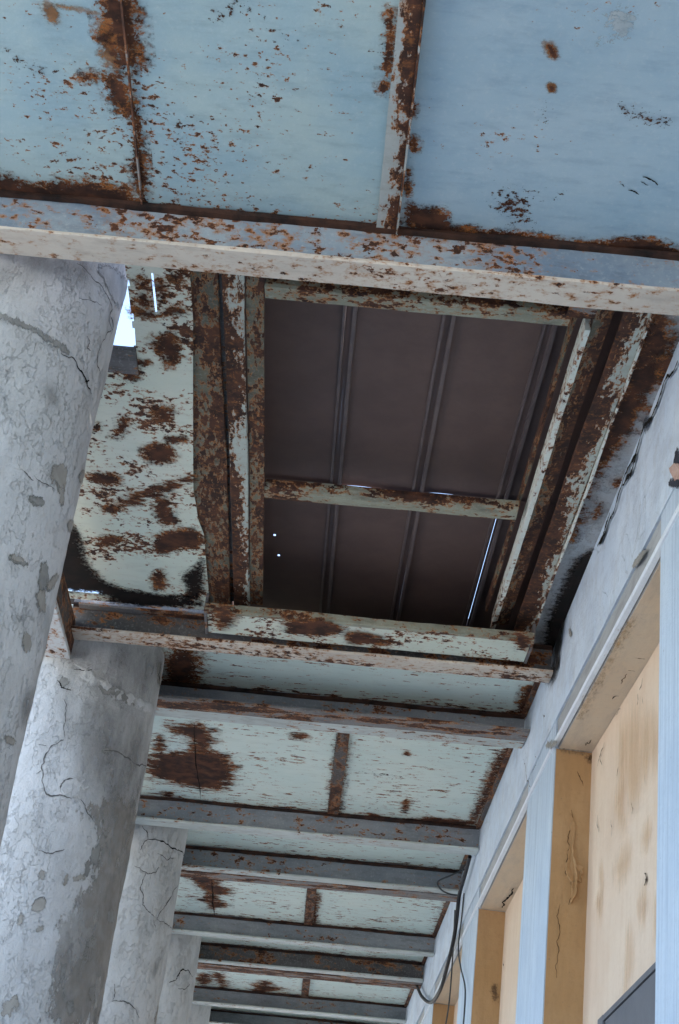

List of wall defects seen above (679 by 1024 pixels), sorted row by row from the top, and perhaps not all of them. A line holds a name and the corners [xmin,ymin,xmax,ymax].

corrosion [0,0,159,202]
corrosion [399,169,679,253]
corrosion [121,271,188,384]
peeling [8,554,59,613]
peeling [27,495,45,507]
peeling [50,463,85,506]
corrosion [97,475,207,599]
corrosion [566,314,679,544]
crack [597,360,678,547]
crack [38,700,70,798]
corrosion [145,719,247,798]
crack [135,826,184,928]